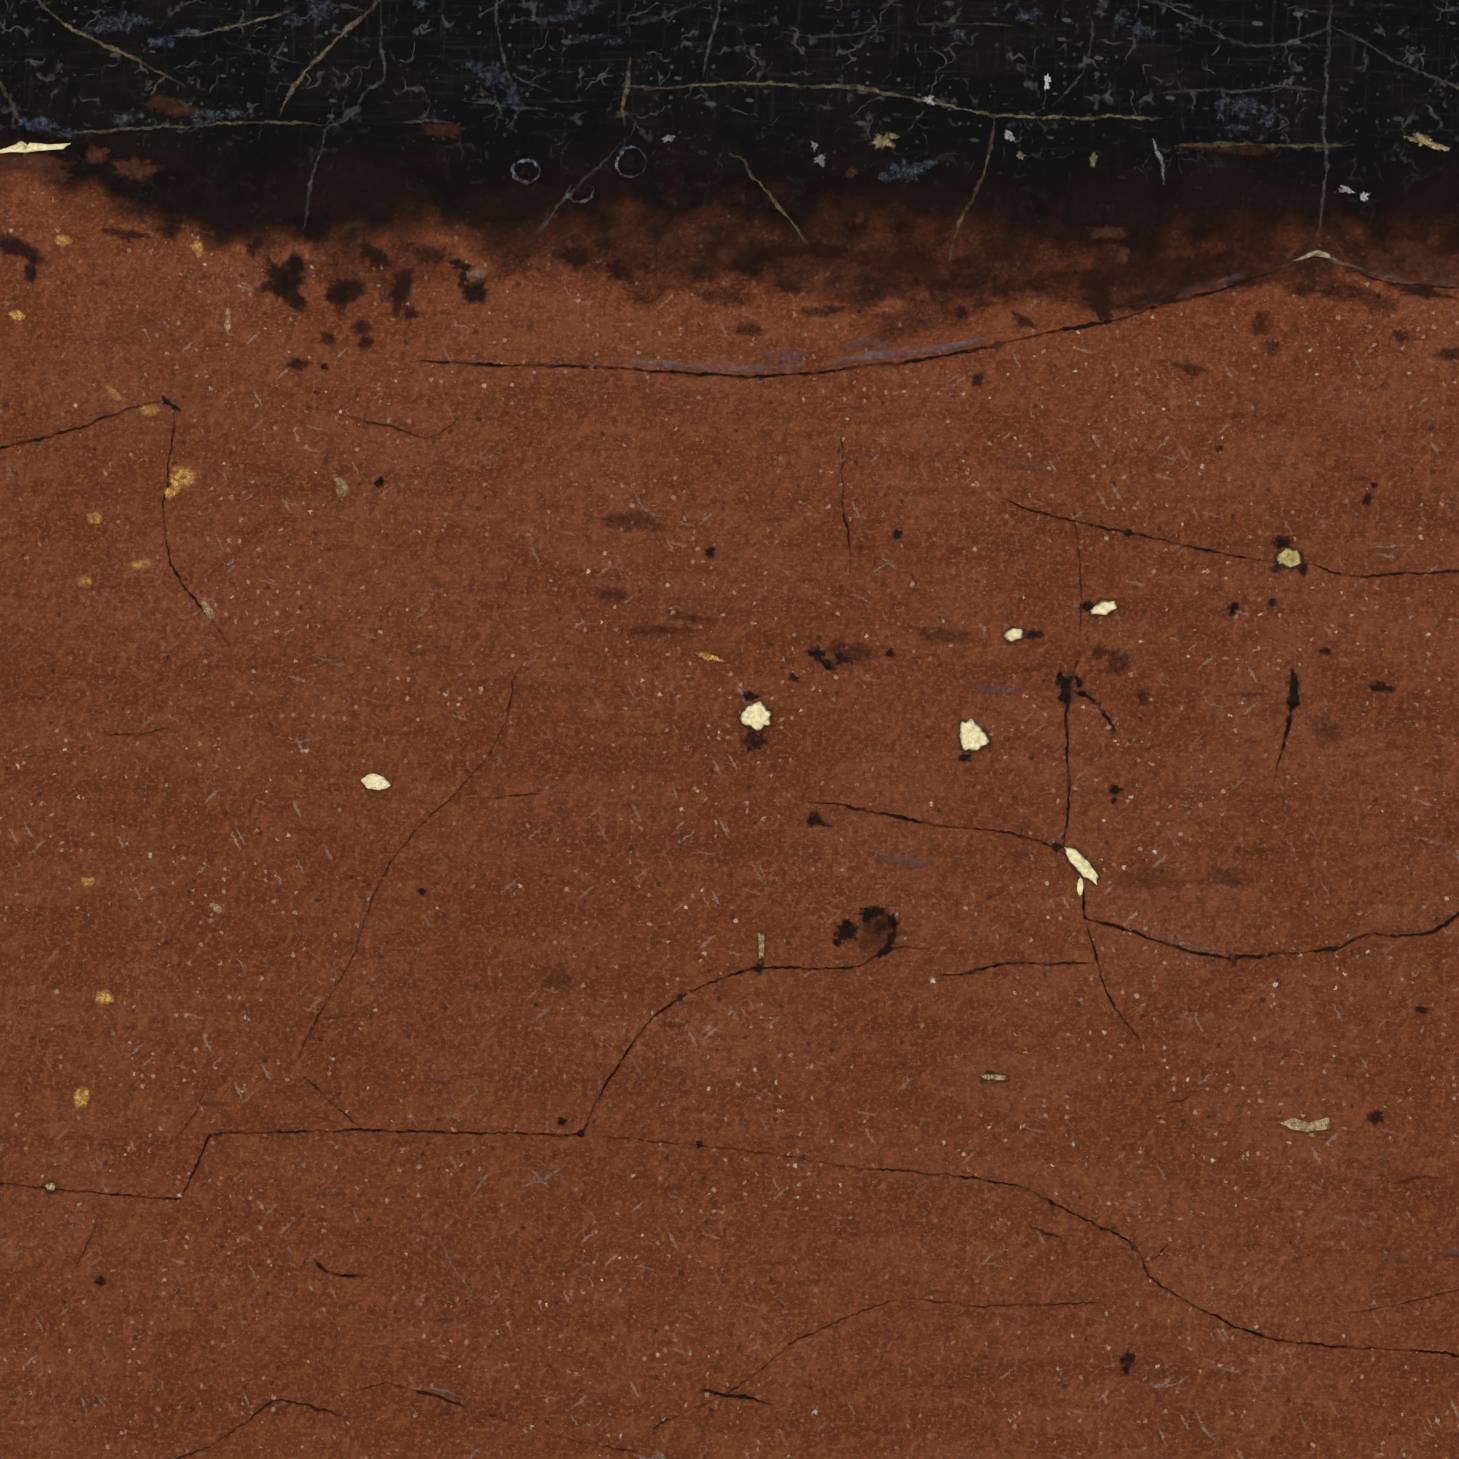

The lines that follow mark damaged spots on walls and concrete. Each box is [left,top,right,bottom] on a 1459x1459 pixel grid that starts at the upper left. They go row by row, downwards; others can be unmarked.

crack [676,0,1154,120]
damp [0,236,43,282]
damp [247,237,307,312]
damp [326,280,363,310]
damp [450,259,486,303]
crack [421,339,986,378]
peeling [738,691,773,752]
peeling [959,719,990,761]
peeling [361,774,391,790]
peeling [1053,841,1098,895]
crack [944,889,1459,1037]
crack [0,941,890,1200]